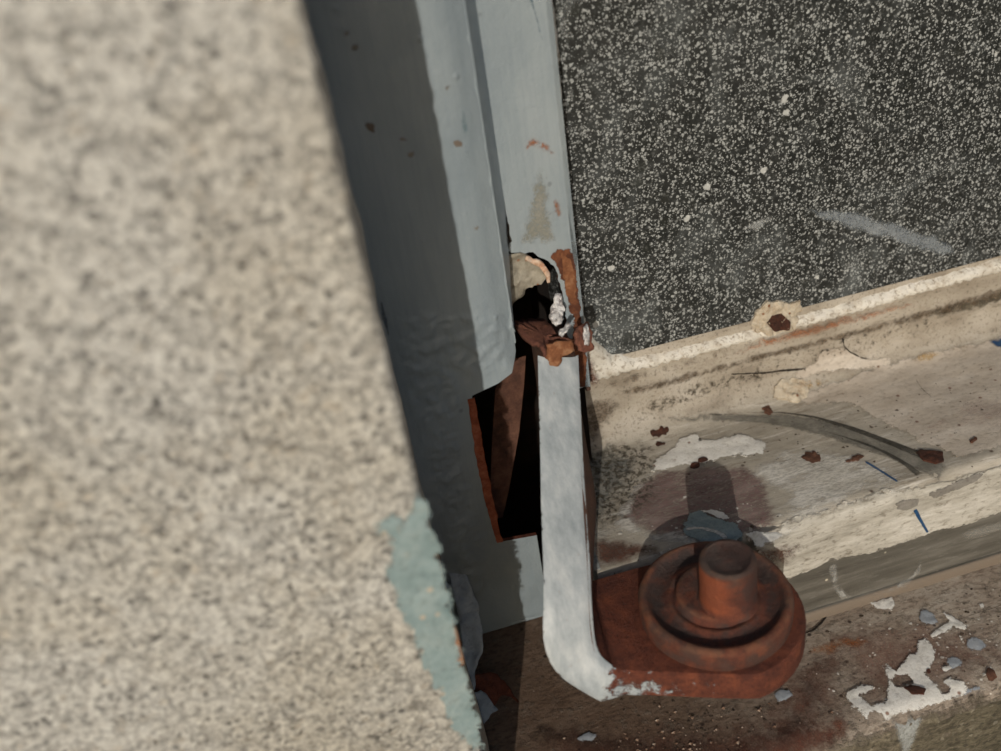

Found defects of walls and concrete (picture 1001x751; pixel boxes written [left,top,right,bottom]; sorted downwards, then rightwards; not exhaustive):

peeling [651,434,766,472]
rust [762,546,798,564]
peeling [846,612,969,722]
rust [474,672,519,724]